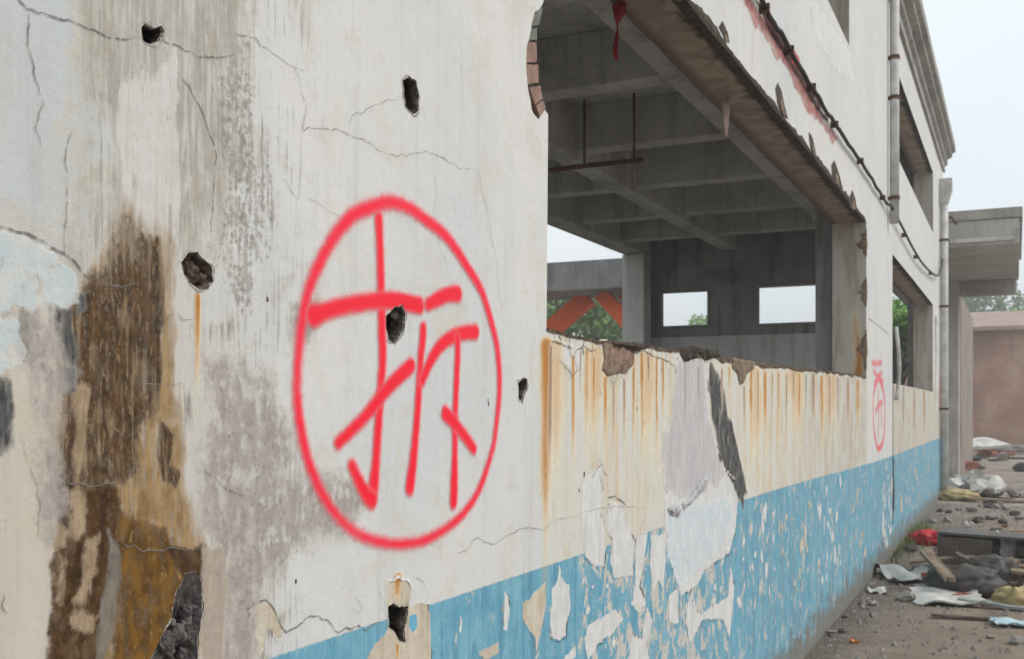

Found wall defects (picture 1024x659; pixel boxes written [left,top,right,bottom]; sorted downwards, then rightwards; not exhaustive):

crack [19,0,134,148]
crack [163,34,505,324]
spalling [672,0,868,257]
damp [0,18,365,659]
crack [459,461,648,553]
corrosion [540,337,664,527]
peeling [478,328,868,659]
corrosion [743,324,862,440]
spalling [882,461,929,550]
crack [247,591,385,633]
peeling [367,575,433,659]